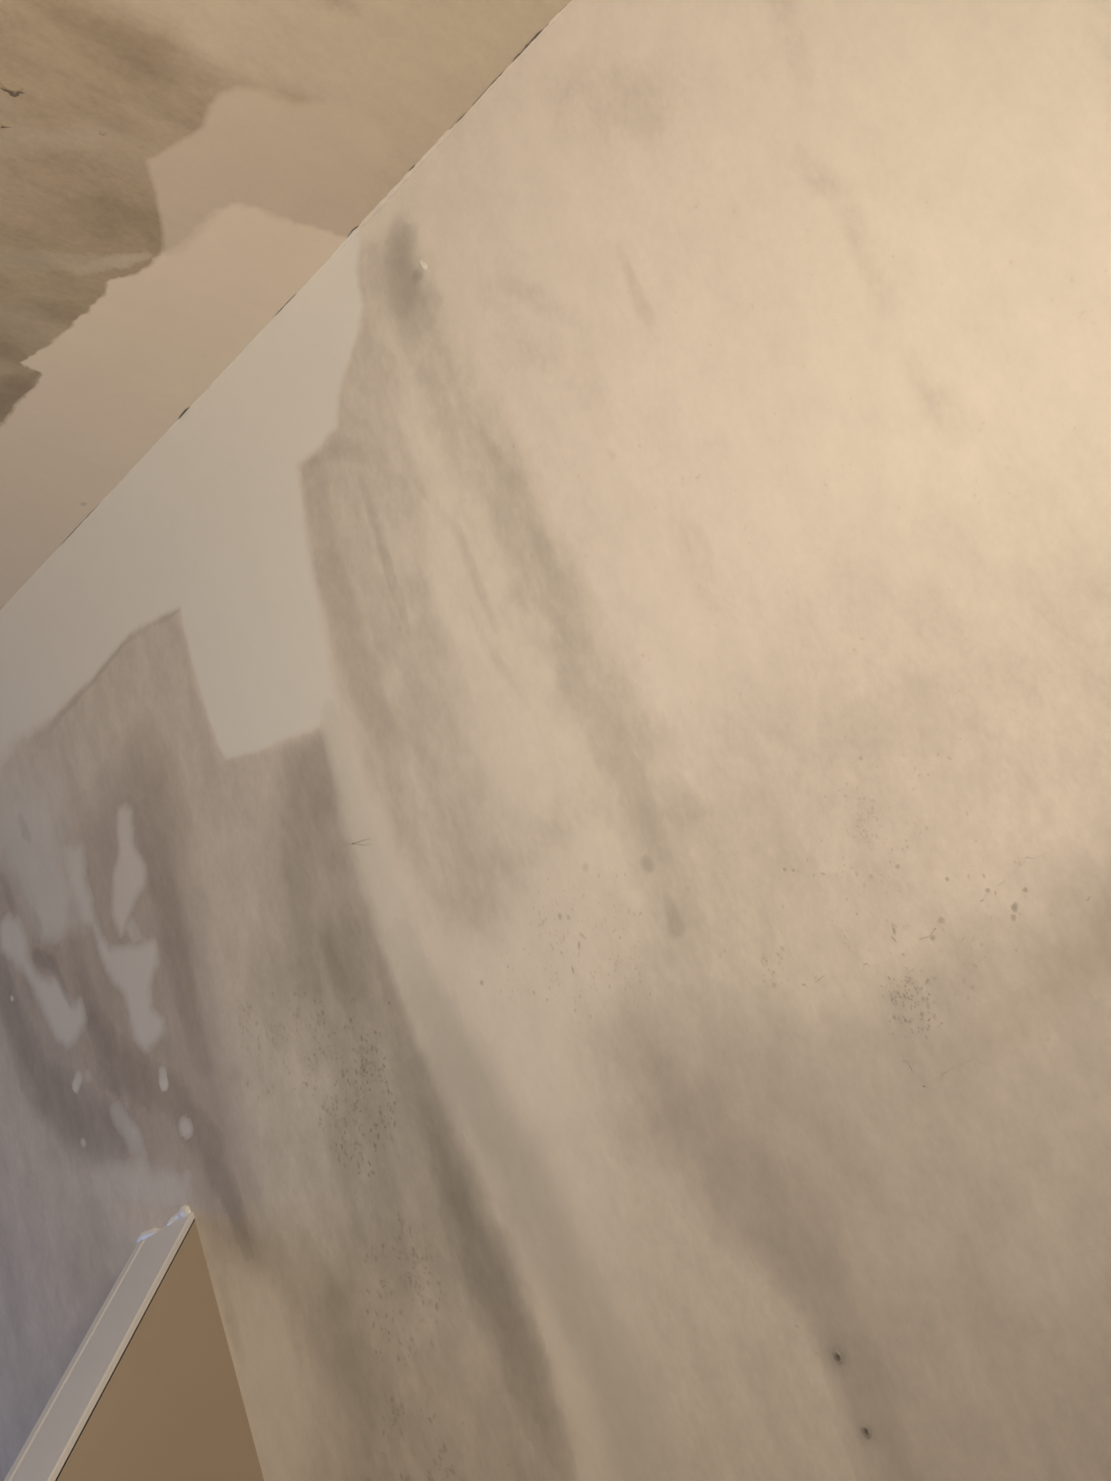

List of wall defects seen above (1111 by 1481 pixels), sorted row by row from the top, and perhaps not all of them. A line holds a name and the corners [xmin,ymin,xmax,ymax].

water stain [0,0,326,422]
water stain [783,134,922,325]
peeling [0,757,167,1055]
water stain [0,718,273,1481]